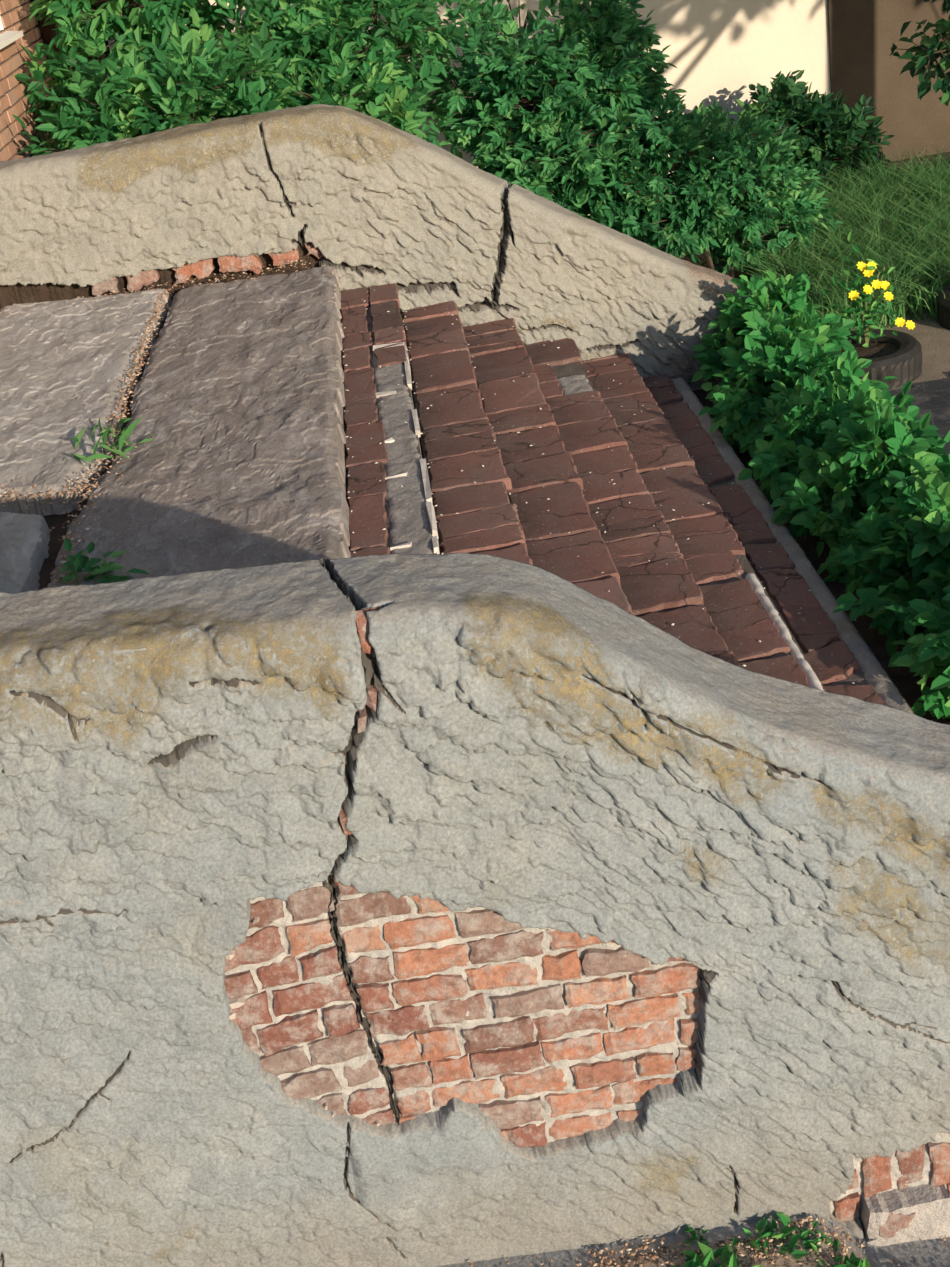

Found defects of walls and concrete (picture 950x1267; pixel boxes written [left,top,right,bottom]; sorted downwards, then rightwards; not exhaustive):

crack [259,124,638,351]
crack [320,558,403,876]
crack [9,1051,130,1163]
crack [343,1127,405,1259]
spalling [224,875,701,1147]
spalling [830,1133,950,1246]